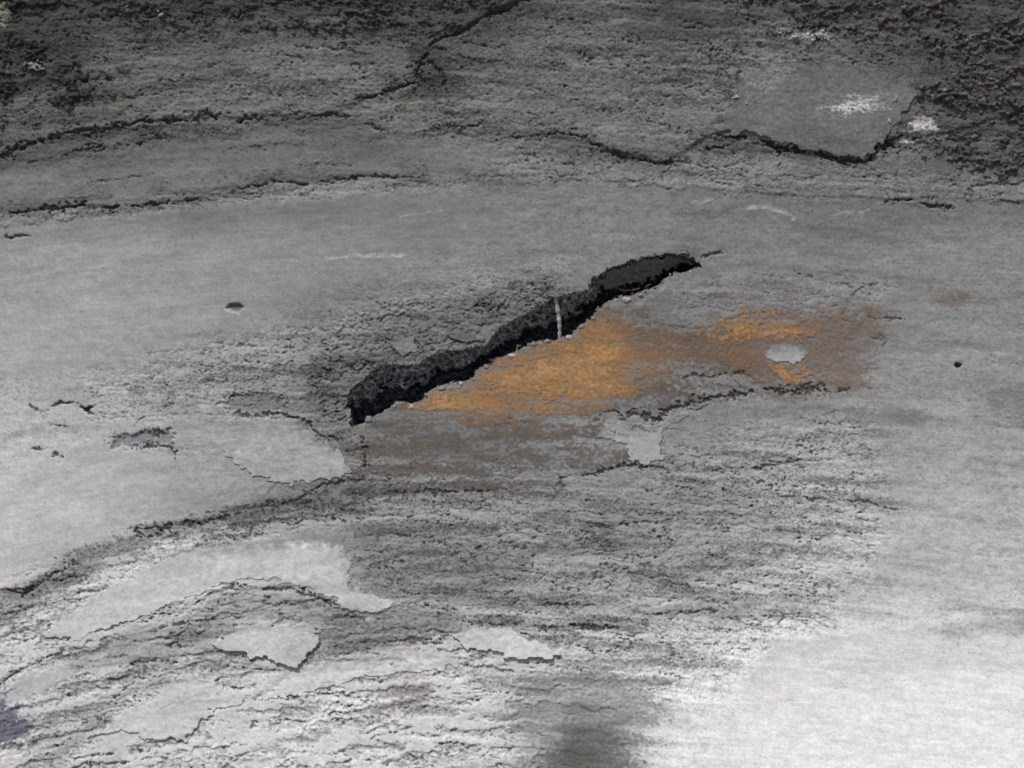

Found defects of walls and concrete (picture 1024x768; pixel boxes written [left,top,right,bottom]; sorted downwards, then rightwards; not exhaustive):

crack [290,0,530,133]
crack [0,109,260,164]
crack [2,173,430,240]
crack [421,123,1019,209]
peeling [392,333,420,357]
rust [410,294,884,424]
spalling [114,429,178,459]
peeling [222,392,354,487]
peeling [39,535,393,642]
peeling [87,622,561,743]